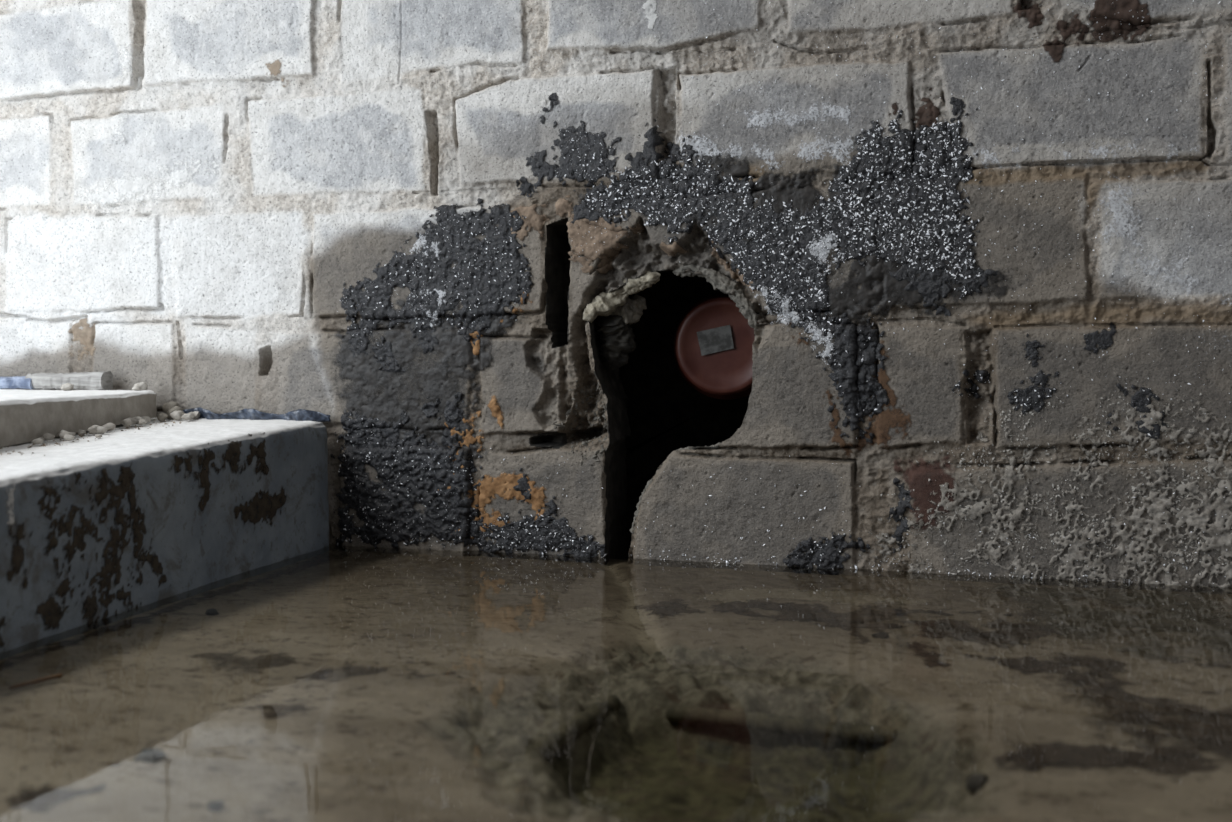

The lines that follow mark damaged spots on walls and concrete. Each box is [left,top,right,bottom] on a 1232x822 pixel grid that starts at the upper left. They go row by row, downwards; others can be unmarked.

corrosion [470,331,483,355]
spalling [510,194,780,565]
corrosion [438,396,503,491]
corrosion [455,473,545,539]
damp [635,588,1232,775]